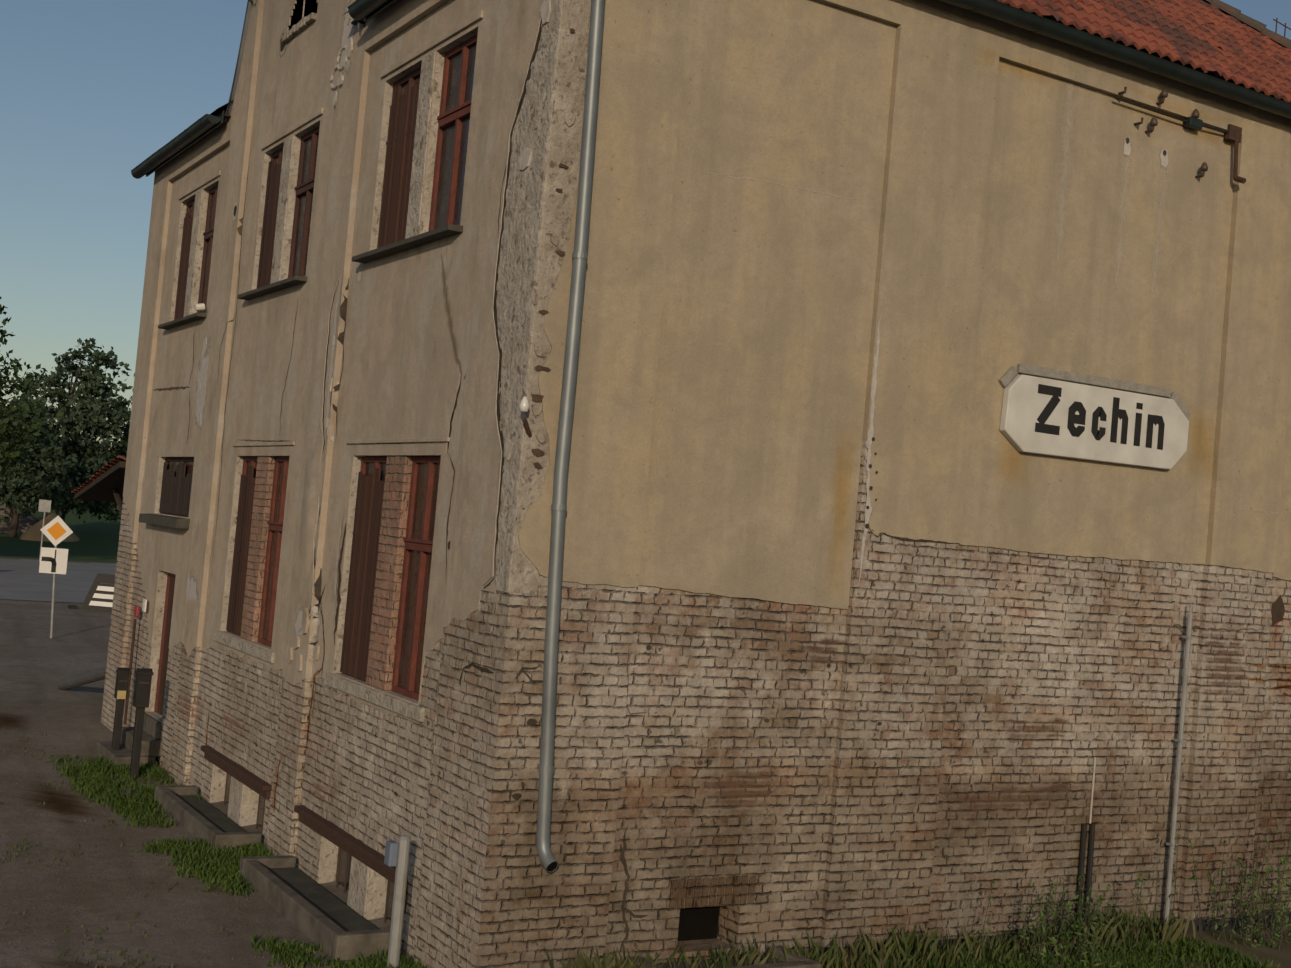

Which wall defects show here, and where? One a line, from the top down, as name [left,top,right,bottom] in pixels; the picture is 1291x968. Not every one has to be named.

crack [155,146,298,575]
crack [320,278,349,461]
crack [369,0,545,588]
spalling [495,0,591,594]
peeling [287,608,321,671]
crack [299,495,325,676]